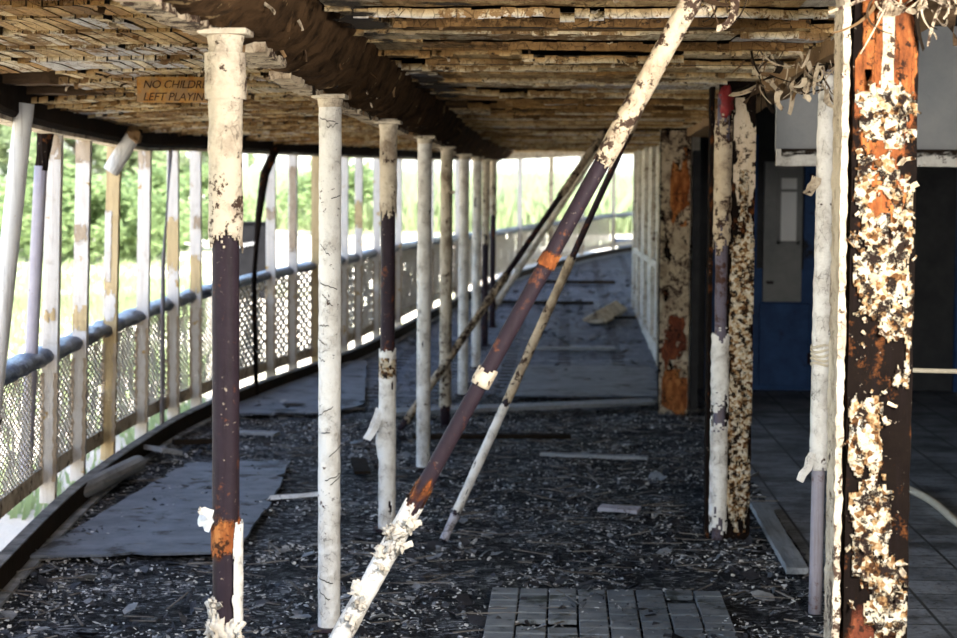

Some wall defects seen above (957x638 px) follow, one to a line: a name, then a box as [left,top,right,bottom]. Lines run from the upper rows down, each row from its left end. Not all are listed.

corrosion [854,0,918,119]
peeling [193,94,255,253]
corrosion [861,114,914,228]
peeling [232,0,807,638]
corrosion [661,305,687,415]
peeling [796,75,834,483]
peeling [841,81,922,638]
peeling [198,506,214,532]
corrosion [211,517,241,559]
corrosion [406,479,436,509]
peeling [0,558,212,638]
corrosion [848,607,883,638]